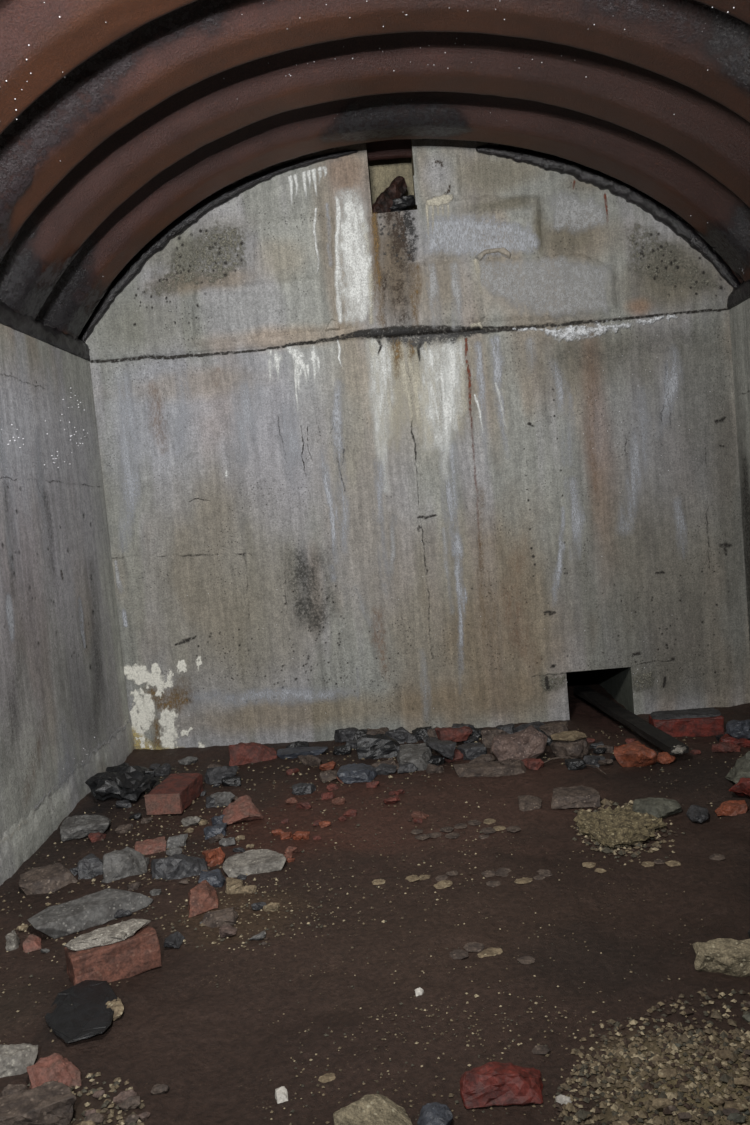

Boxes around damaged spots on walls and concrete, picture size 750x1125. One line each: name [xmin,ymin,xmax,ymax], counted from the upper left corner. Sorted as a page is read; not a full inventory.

damp [322,98,470,142]
damp [288,167,327,202]
rust [372,213,383,319]
rust [392,338,414,366]
damp [313,191,680,647]
crack [89,308,728,659]